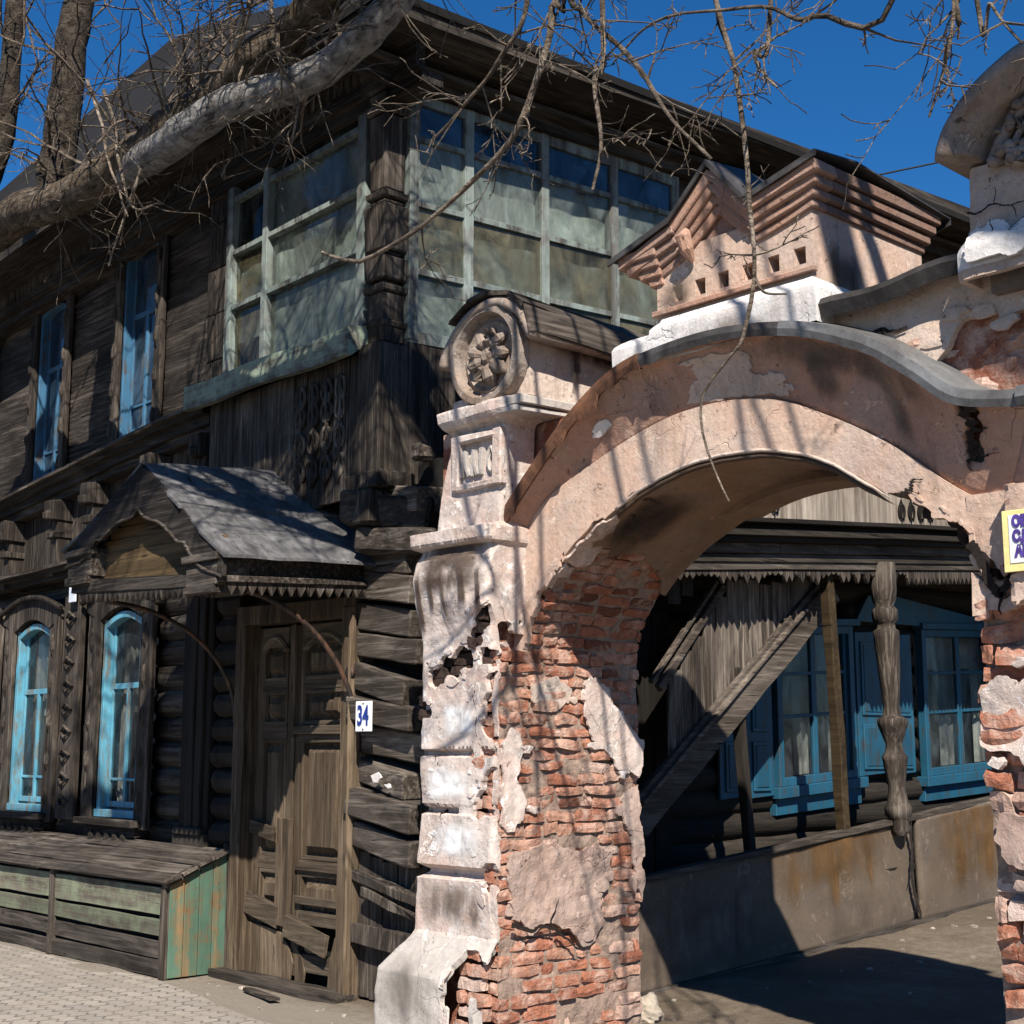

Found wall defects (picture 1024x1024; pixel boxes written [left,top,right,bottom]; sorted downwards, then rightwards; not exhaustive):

crack [967,186,1024,231]
spalling [974,377,998,389]
crack [957,406,999,471]
peeling [418,595,538,857]
peeling [979,656,1024,770]
peeling [530,676,646,897]
peeling [477,843,613,947]
crack [511,899,580,950]
corrosion [813,832,867,898]
corrosion [955,805,994,867]
peeling [994,812,1024,892]
spalling [439,940,493,1024]